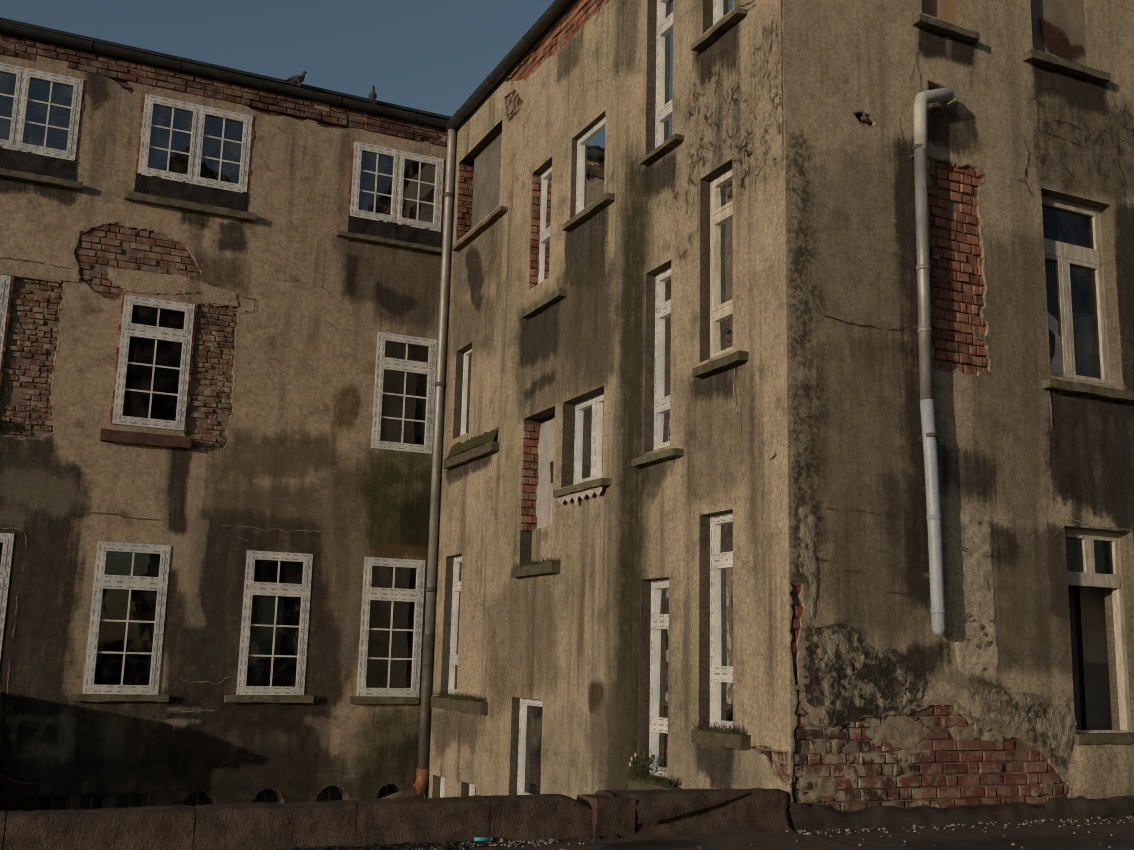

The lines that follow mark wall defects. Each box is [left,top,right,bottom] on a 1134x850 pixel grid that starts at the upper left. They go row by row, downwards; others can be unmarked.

spalling [504,0,610,124]
leakage [1033,64,1107,114]
spalling [71,221,203,302]
spalling [927,155,992,379]
flaking render [0,276,65,441]
flaking render [183,302,239,453]
leakage [992,203,1134,668]
leakage [0,432,430,811]
leakage [837,693,874,727]
spalling [751,501,1077,835]